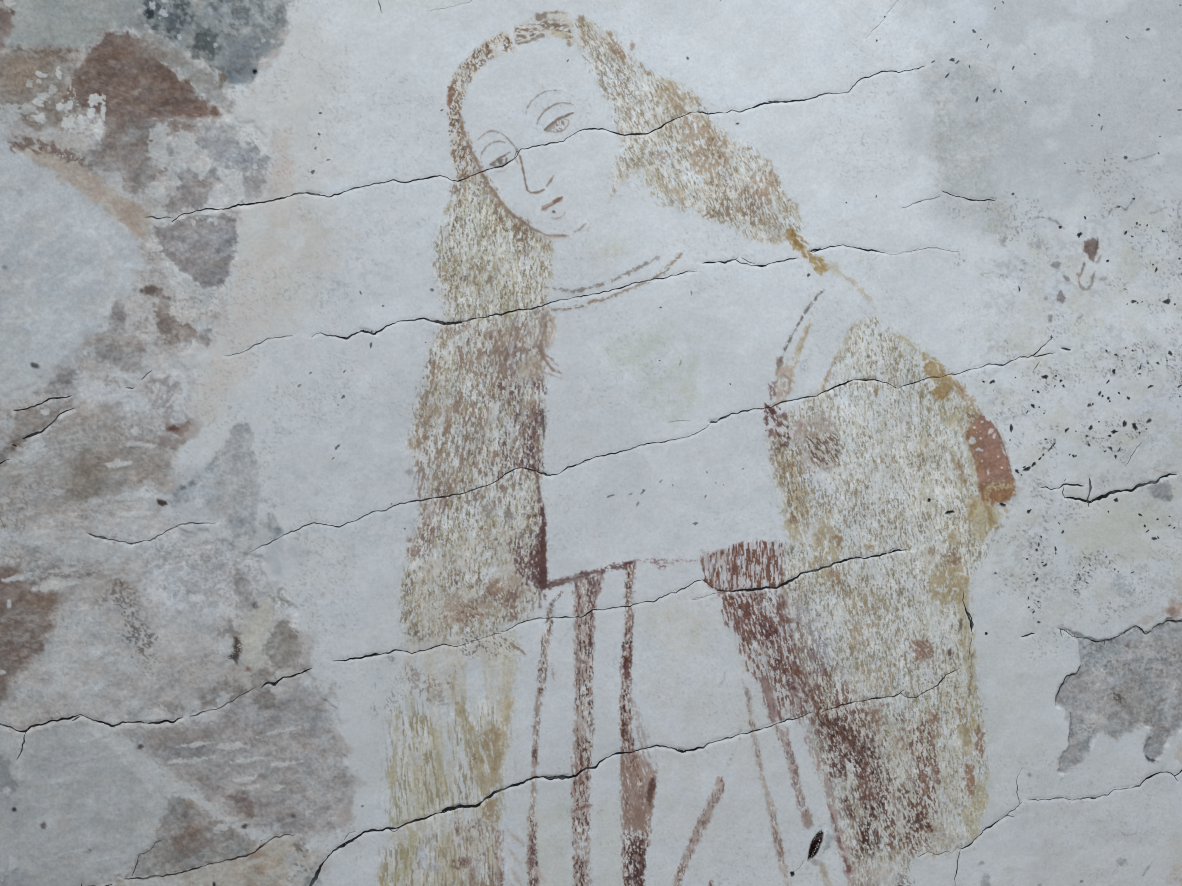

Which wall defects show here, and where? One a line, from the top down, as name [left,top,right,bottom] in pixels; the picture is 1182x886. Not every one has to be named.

crack [148,66,924,222]
flaking render [0,0,274,472]
crack [225,244,958,356]
flaking render [61,420,286,545]
crack [253,337,1071,551]
crack [1041,443,1177,507]
flaking render [0,529,162,704]
flaking render [0,559,364,886]
crack [0,548,907,759]
crack [309,592,974,886]
crack [918,768,1182,880]
flaking render [1053,617,1182,786]